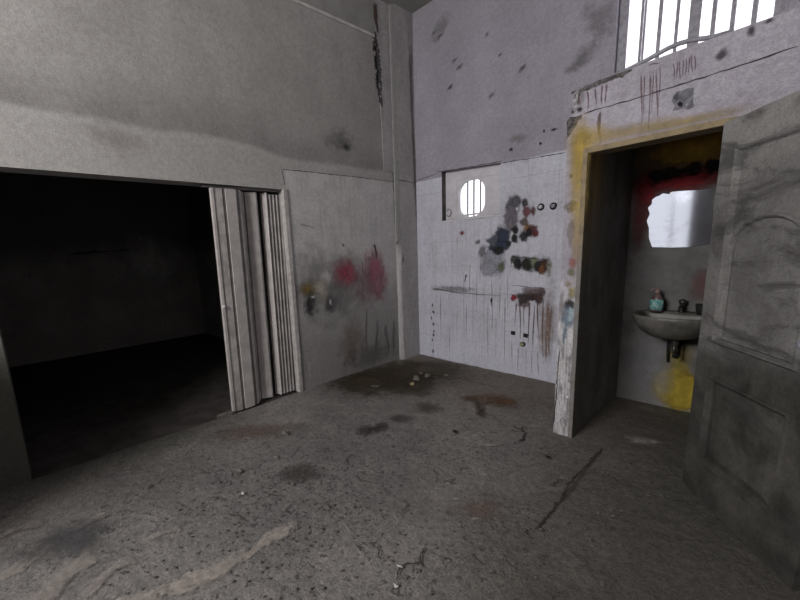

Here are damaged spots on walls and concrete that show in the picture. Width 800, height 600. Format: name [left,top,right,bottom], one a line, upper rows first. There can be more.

flaking render [567,69,632,139]
peeling [672,88,694,111]
water stain [341,363,458,395]
crack [535,449,602,529]